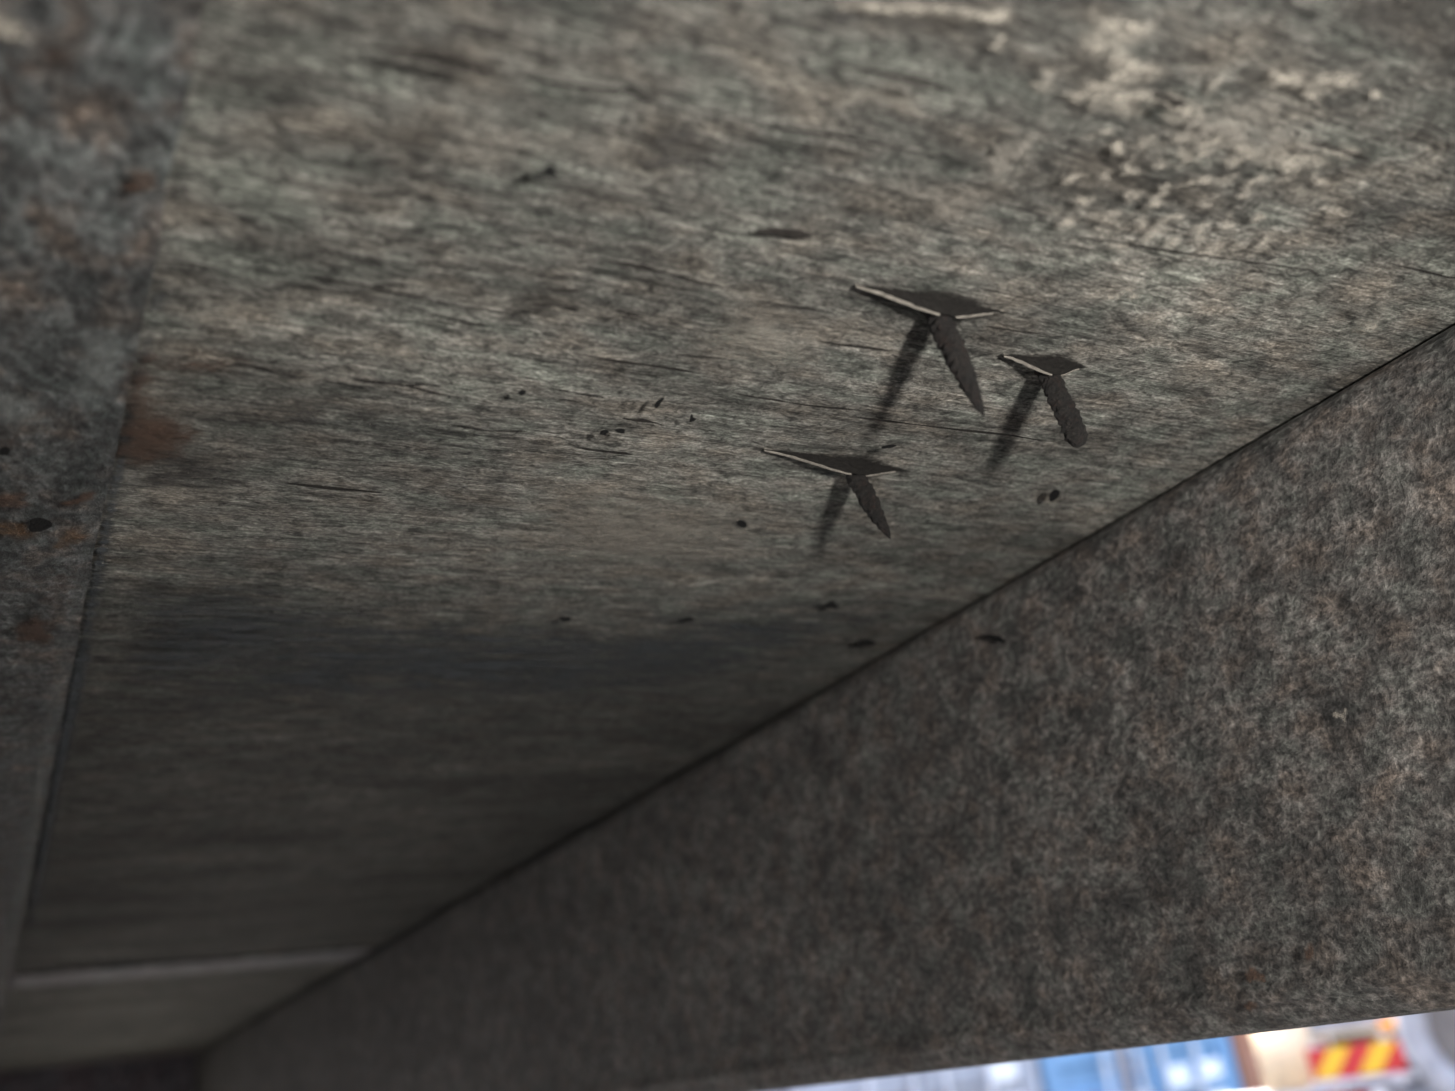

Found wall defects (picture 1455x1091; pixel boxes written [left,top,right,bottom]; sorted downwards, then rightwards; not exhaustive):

damp [1069,18,1359,185]